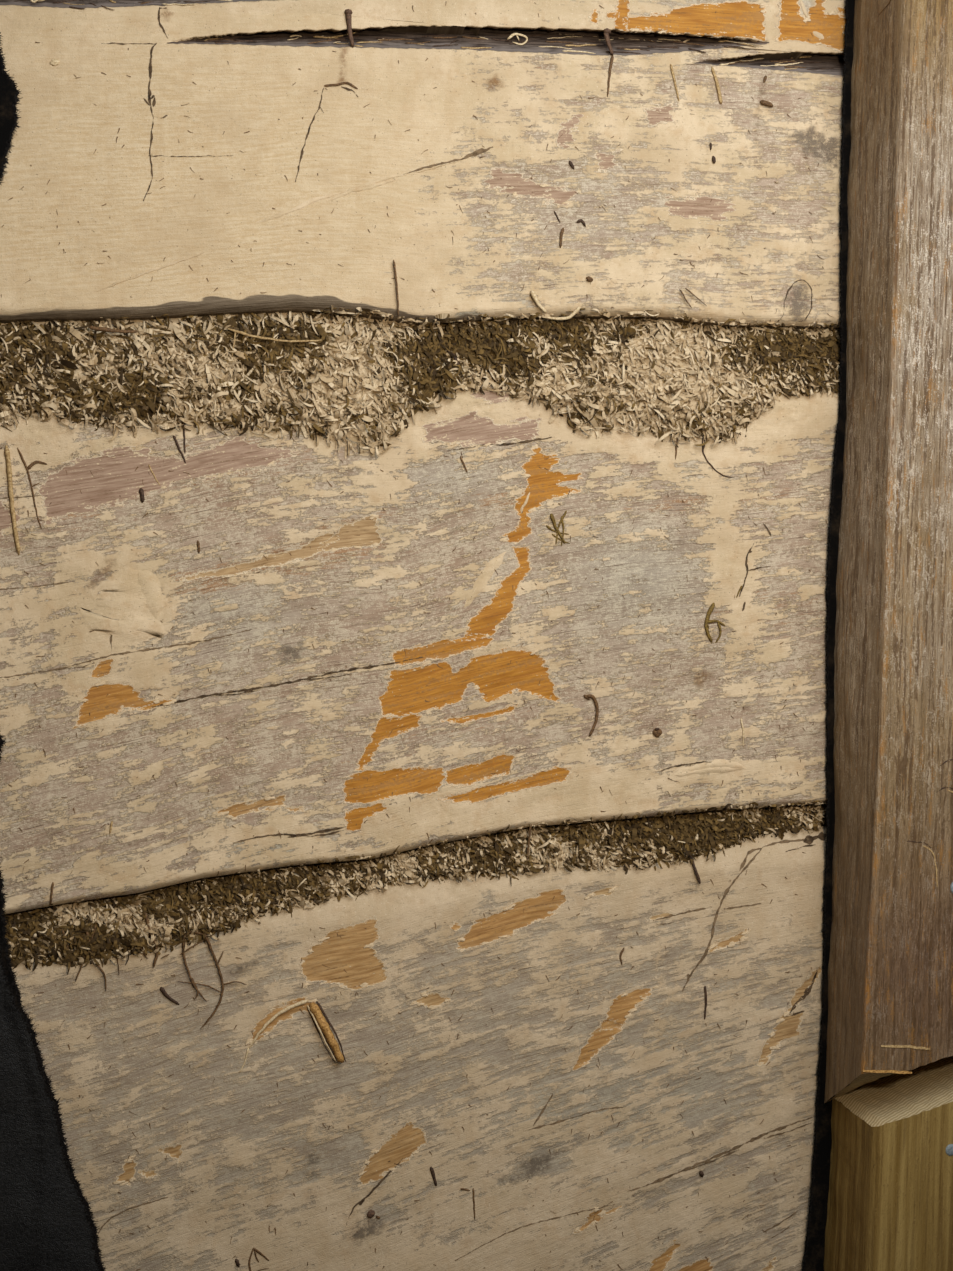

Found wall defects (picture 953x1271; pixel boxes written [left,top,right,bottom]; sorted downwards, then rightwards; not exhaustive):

peeling [589,0,846,56]
crack [0,0,844,201]
peeling [342,385,584,833]
peeling [71,657,177,729]
crack [0,629,251,678]
crack [154,657,422,707]
peeling [450,885,567,952]
peeling [245,915,388,1048]
peeling [572,984,659,1071]
peeling [356,1121,427,1188]
peeling [648,1239,715,1271]